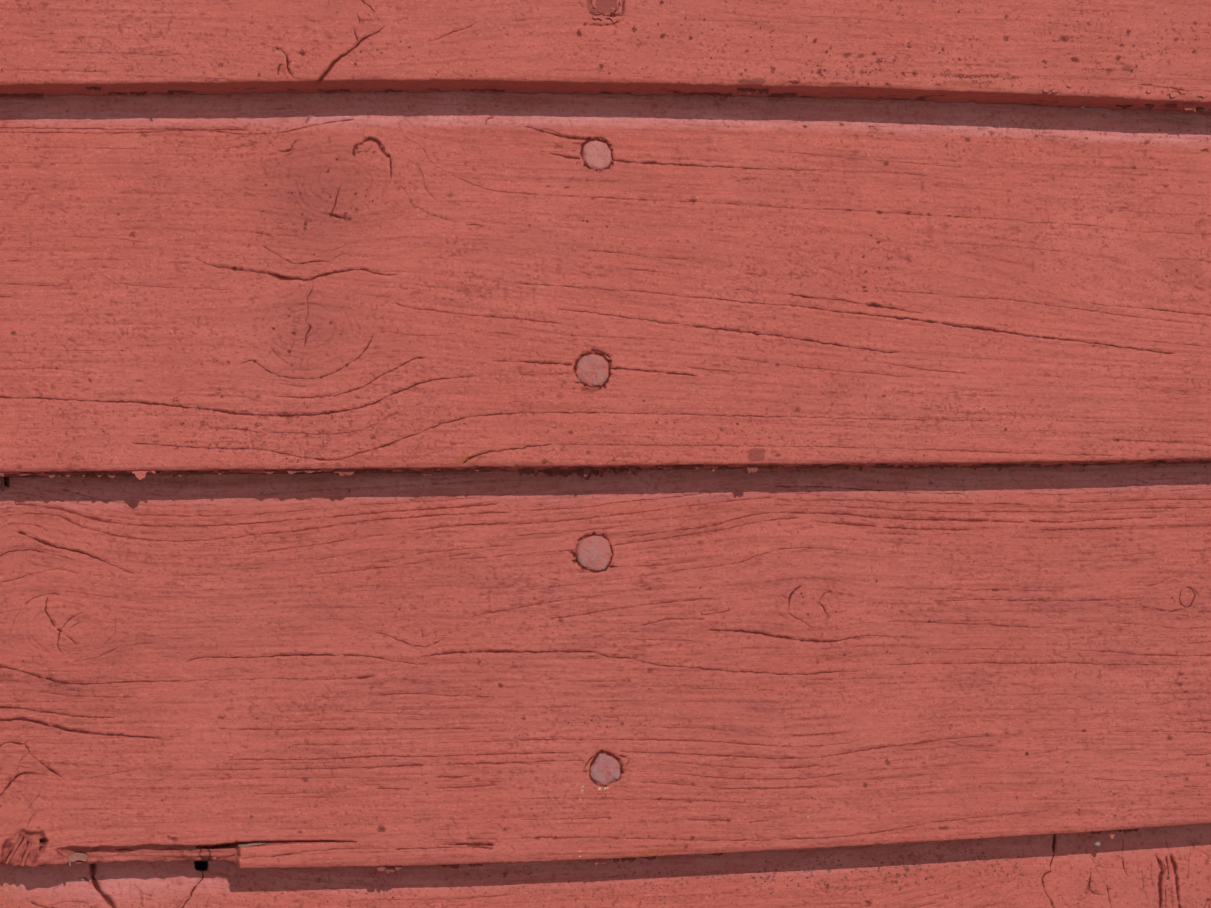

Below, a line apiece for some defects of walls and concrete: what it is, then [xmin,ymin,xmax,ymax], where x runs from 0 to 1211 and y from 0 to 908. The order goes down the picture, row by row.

crack [276,0,381,89]
crack [83,864,115,908]
crack [184,840,357,905]
crack [1042,834,1056,905]
crack [1156,855,1181,908]